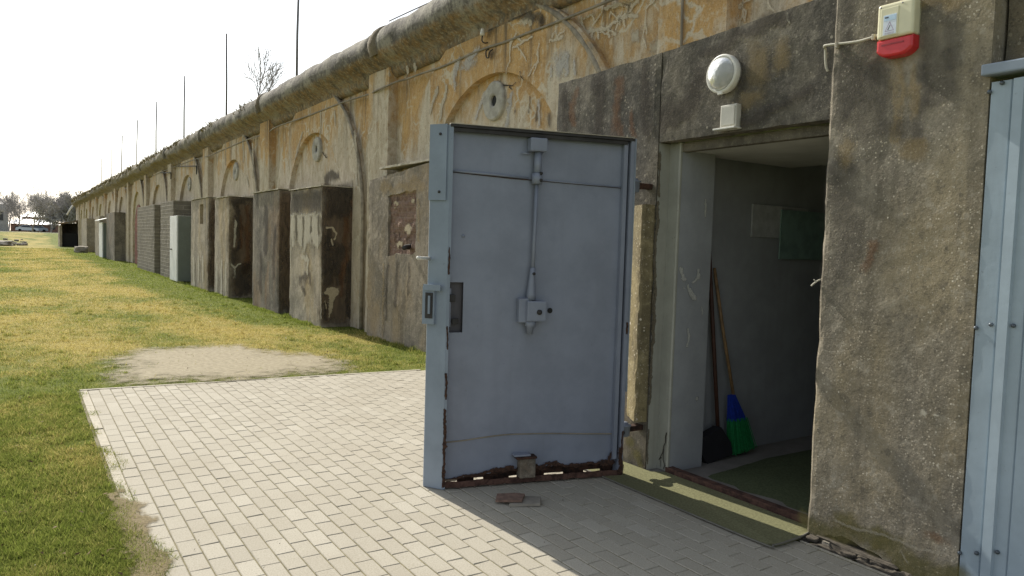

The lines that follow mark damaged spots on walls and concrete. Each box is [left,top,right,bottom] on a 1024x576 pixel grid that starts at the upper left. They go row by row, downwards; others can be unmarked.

spalling [390,190,417,256]
corrosion [442,373,518,487]
corrosion [535,431,624,475]